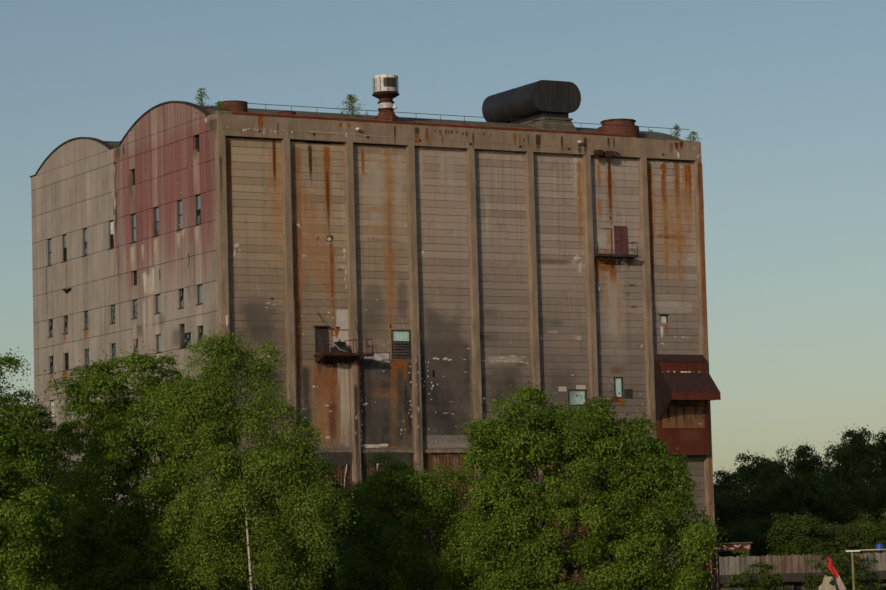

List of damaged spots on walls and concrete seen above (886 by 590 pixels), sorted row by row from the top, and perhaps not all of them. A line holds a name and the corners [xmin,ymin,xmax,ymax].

damp [144,269,154,331]
corrosion [291,148,302,408]
corrosion [594,258,630,282]
corrosion [647,162,707,335]
corrosion [314,364,338,440]
corrosion [667,404,712,510]